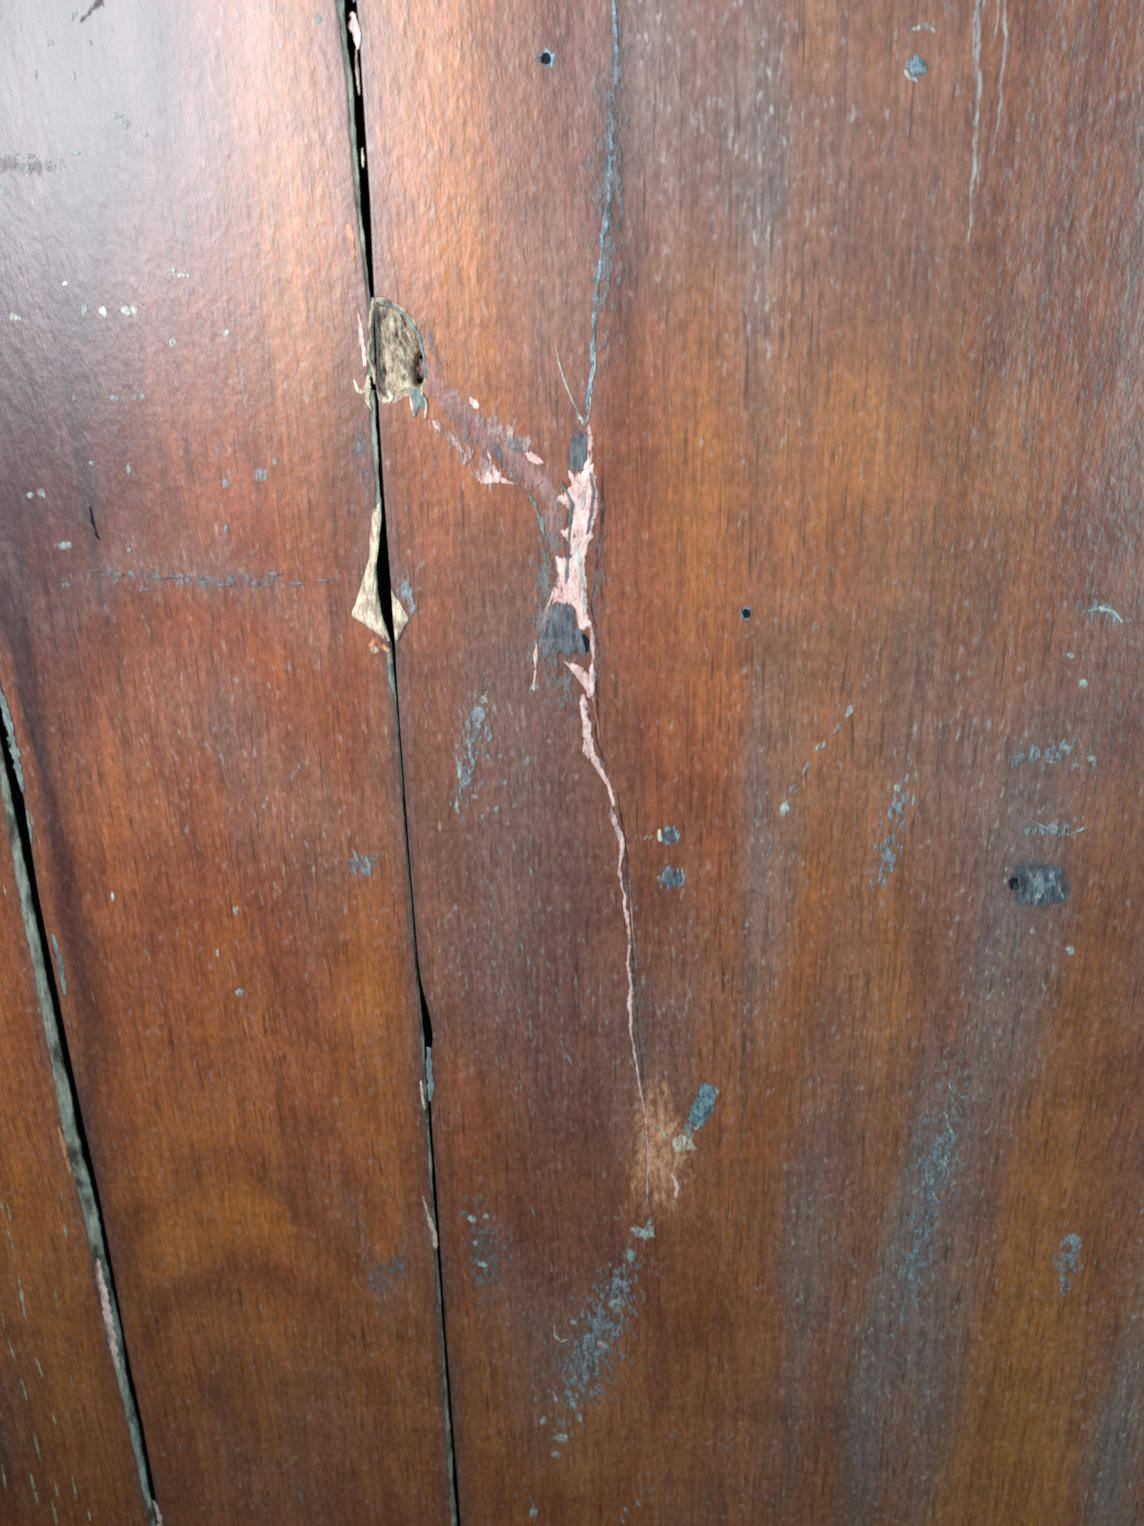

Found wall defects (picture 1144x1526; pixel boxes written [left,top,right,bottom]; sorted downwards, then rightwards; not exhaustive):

spalling [353,297,428,404]
crack [519,0,649,1205]